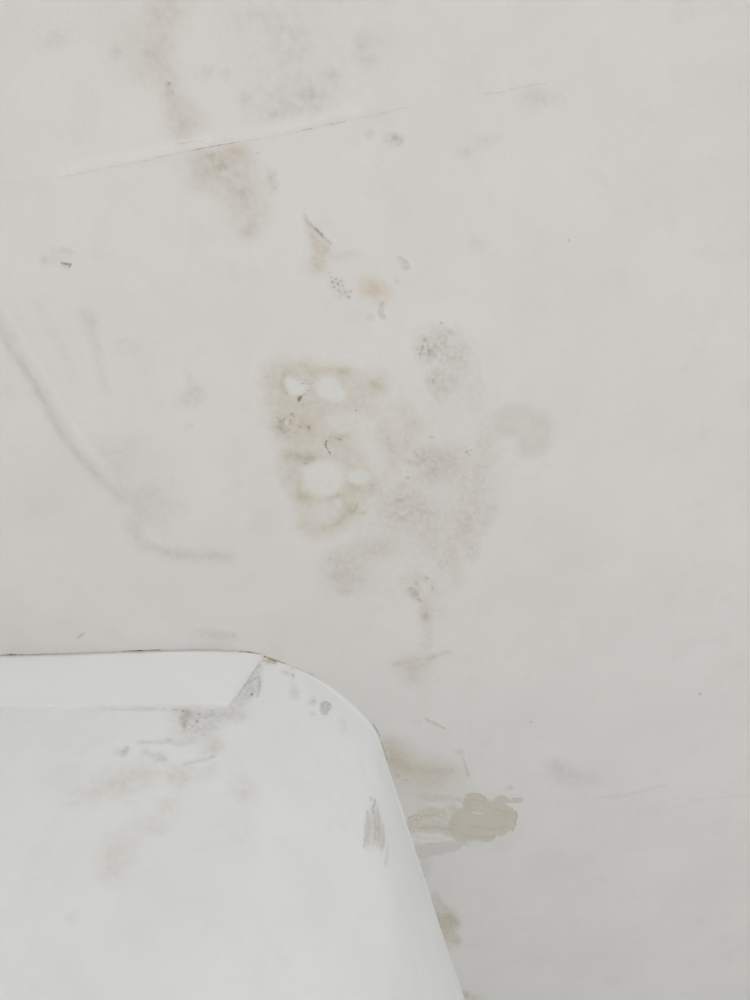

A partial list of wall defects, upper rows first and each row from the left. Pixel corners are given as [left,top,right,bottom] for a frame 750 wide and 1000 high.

leakage [30,0,410,259]
crack [59,106,409,177]
leakage [307,310,559,694]
peeling [400,791,525,861]